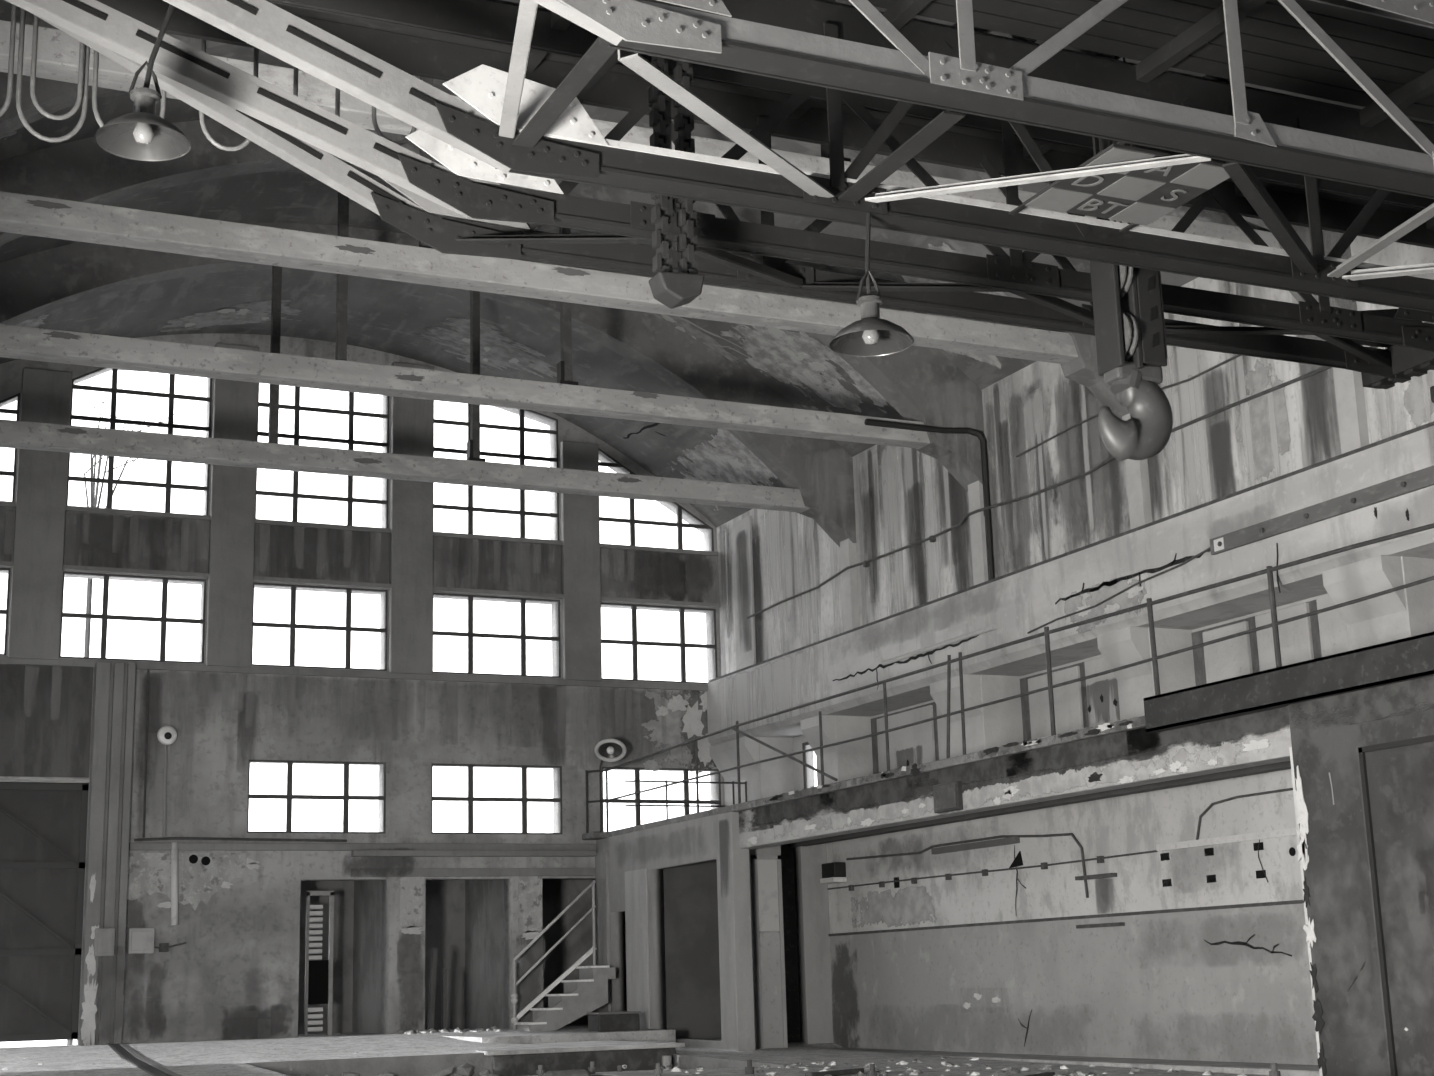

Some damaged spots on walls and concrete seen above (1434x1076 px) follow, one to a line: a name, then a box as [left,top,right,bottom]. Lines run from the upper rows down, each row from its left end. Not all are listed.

damp [1226,281,1247,296]
damp [860,445,966,612]
damp [987,380,1130,576]
damp [1167,345,1291,508]
damp [1306,364,1327,449]
peeling [641,689,714,772]
peeling [747,739,1270,845]
crack [1204,934,1292,957]
spalling [1289,766,1327,1076]